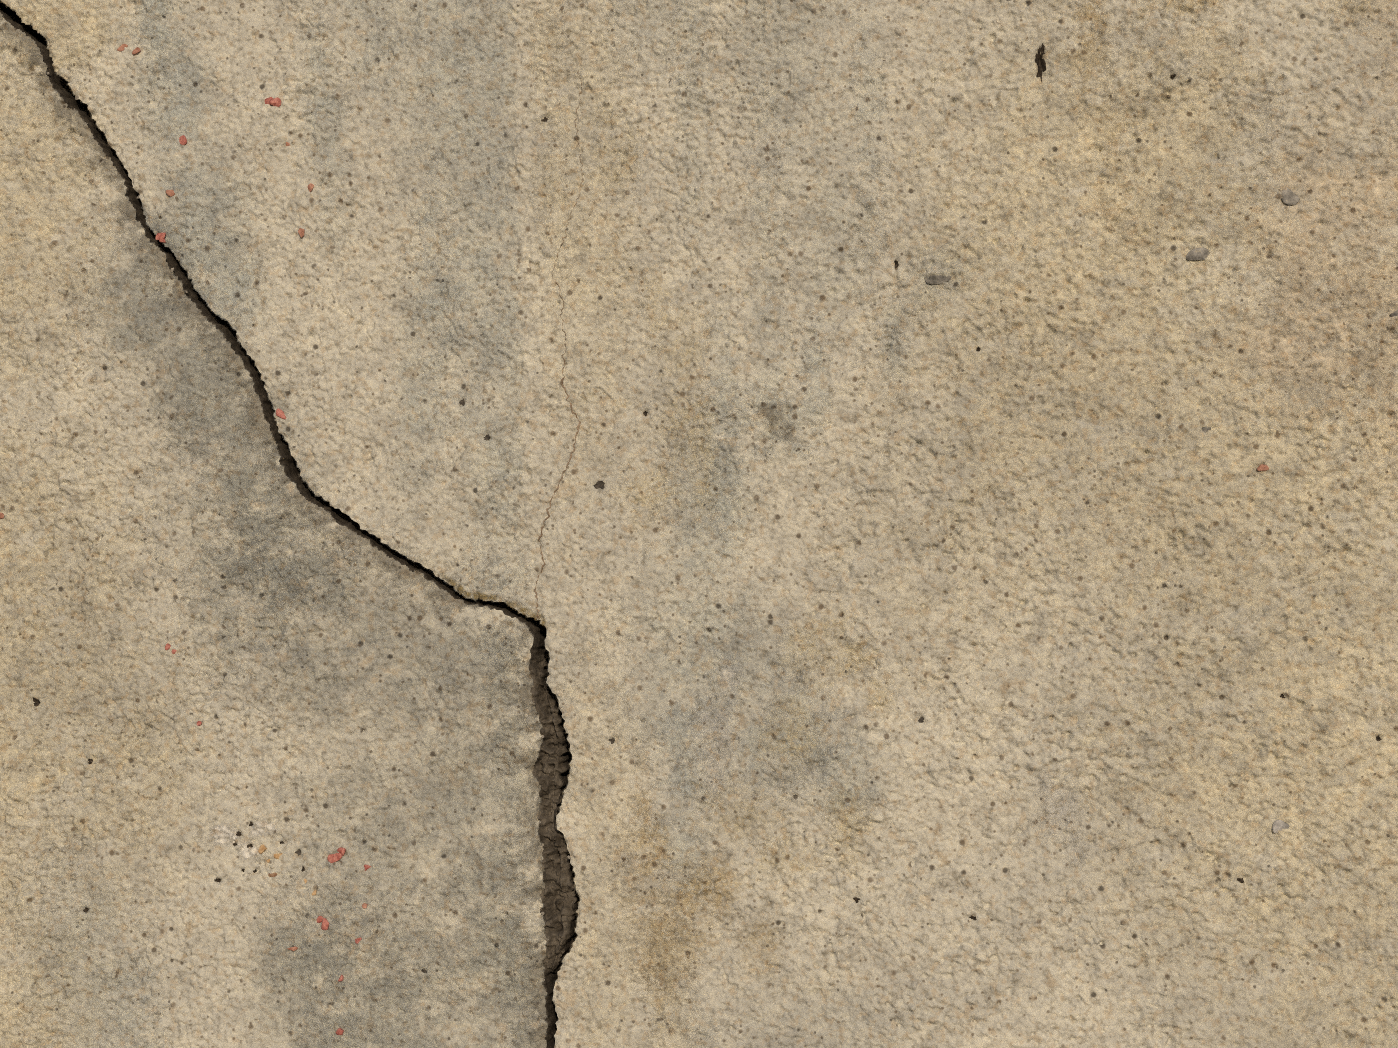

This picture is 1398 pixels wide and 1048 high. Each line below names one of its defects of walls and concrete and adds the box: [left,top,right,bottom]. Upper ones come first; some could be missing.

crack [0,0,583,1048]